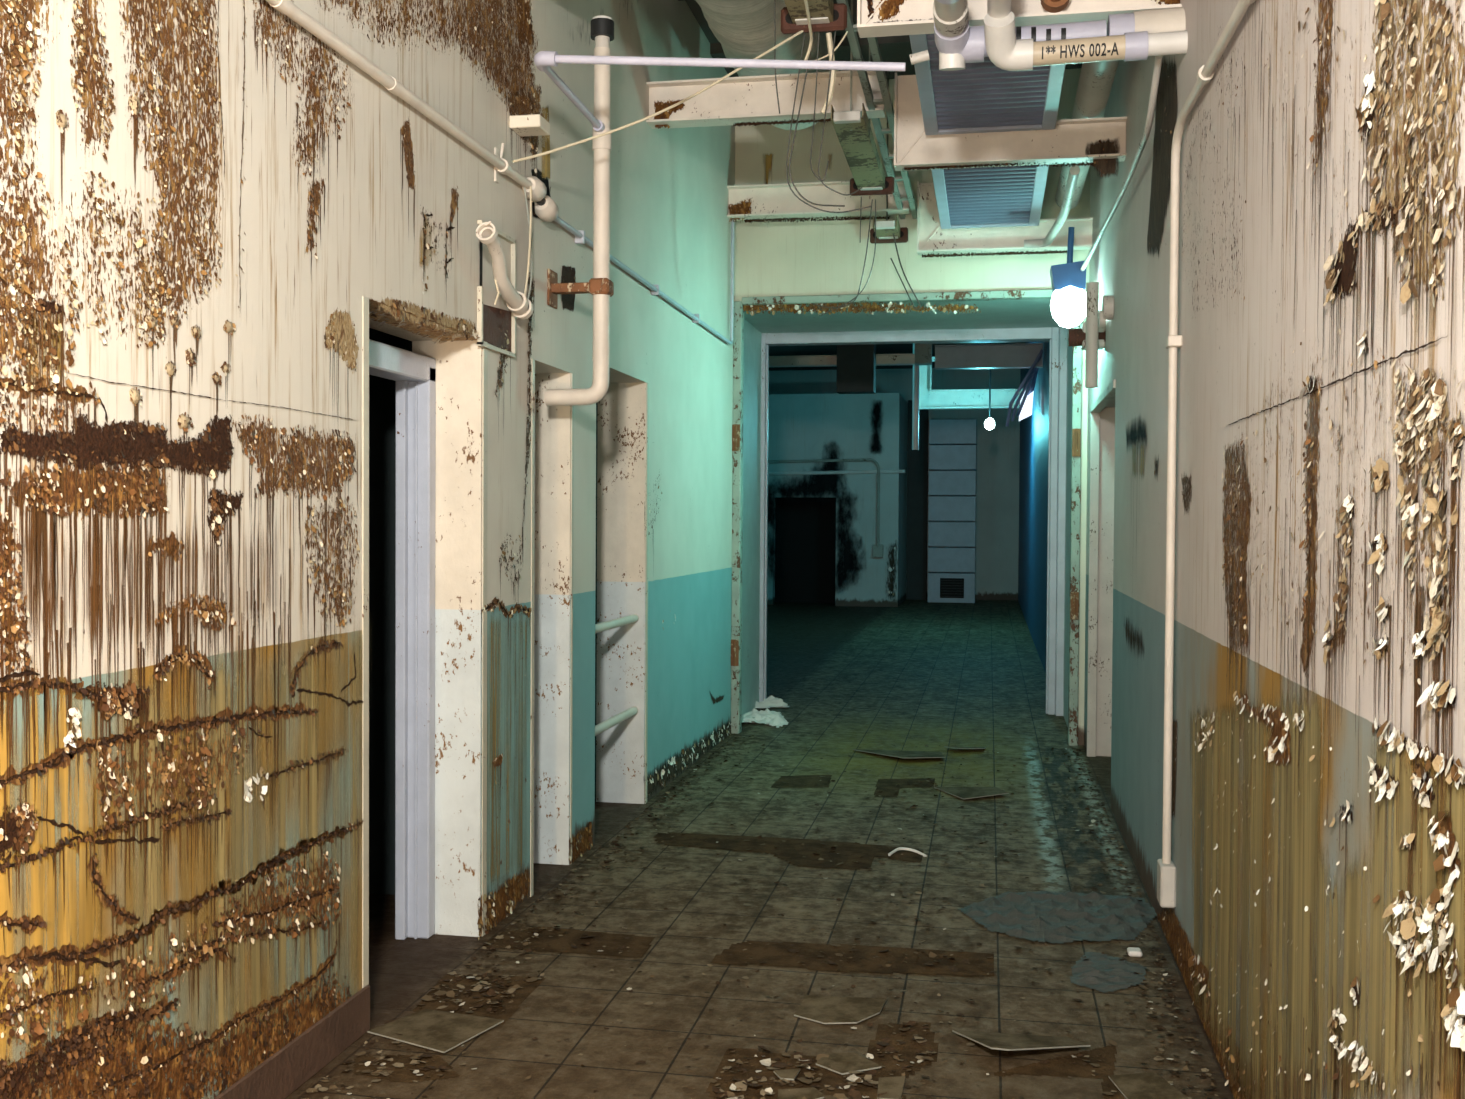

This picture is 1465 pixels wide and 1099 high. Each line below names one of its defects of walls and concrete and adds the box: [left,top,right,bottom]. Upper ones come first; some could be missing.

rust [867,0,932,23]
peeling [0,0,225,400]
rust [253,0,352,268]
rust [400,118,459,264]
rust [0,298,96,436]
crack [1229,336,1447,425]
spalling [0,411,234,603]
peeling [63,707,82,753]
peeling [244,766,268,809]
crack [0,637,363,1099]
rust [0,849,351,1099]
peeling [706,1021,939,1099]